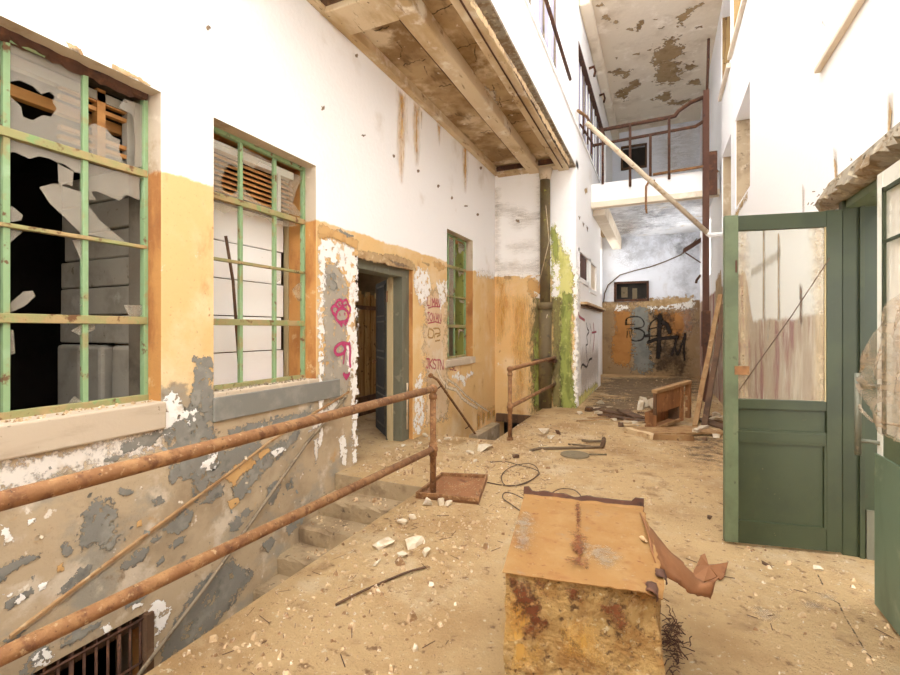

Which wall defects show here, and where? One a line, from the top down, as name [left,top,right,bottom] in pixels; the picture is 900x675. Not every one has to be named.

peeling [596,2,705,106]
peeling [57,223,448,594]
flaking render [452,371,473,387]
leakage [529,293,542,414]
leakage [550,225,699,415]
leakage [687,434,723,463]
peeling [4,575,35,611]
peeling [0,553,41,583]
peeling [19,620,113,675]
peeling [125,556,254,664]